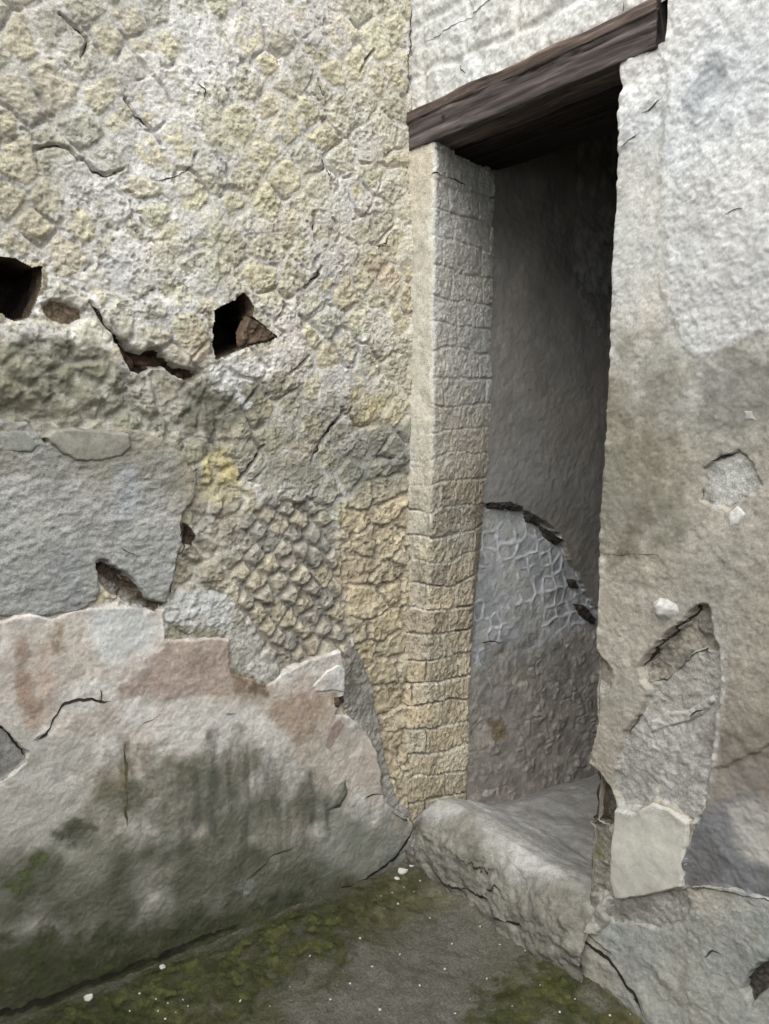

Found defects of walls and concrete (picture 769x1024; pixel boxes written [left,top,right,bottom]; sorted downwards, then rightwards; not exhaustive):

spalling [0,256,43,321]
spalling [212,292,277,360]
flaking render [702,452,763,526]
crack [34,690,109,740]
flaking render [466,501,769,936]
flaking render [0,726,26,781]
crack [585,936,642,1013]